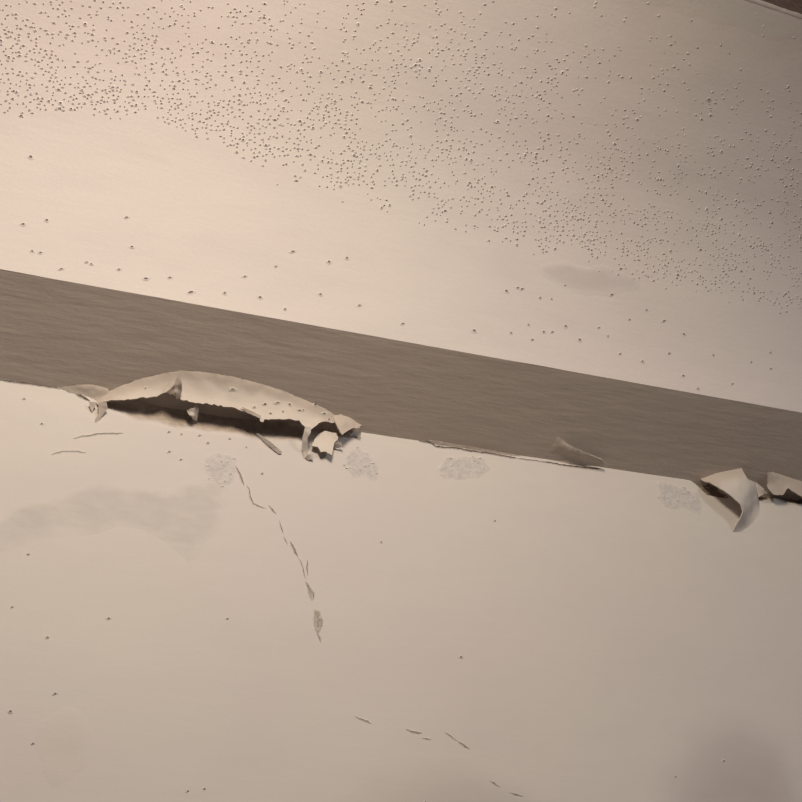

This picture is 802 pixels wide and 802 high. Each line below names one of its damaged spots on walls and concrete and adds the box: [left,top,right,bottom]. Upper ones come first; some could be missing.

spalling [56,384,379,481]
peeling [546,436,605,466]
crack [235,467,309,579]
peeling [689,468,802,532]
crack [406,729,470,750]